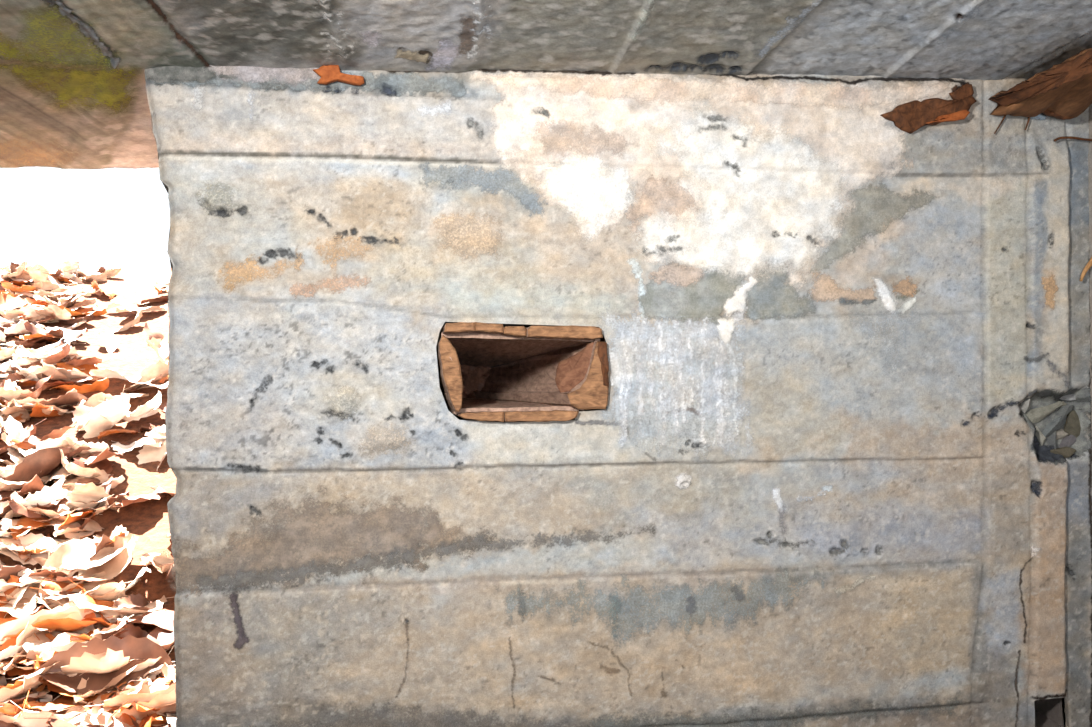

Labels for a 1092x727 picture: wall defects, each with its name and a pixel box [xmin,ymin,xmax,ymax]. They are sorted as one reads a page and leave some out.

leakage [423,70,964,447]
spalling [988,388,1092,465]
leakage [171,488,521,598]
leakage [534,526,655,548]
crack [1009,326,1092,727]
leakage [506,568,824,643]